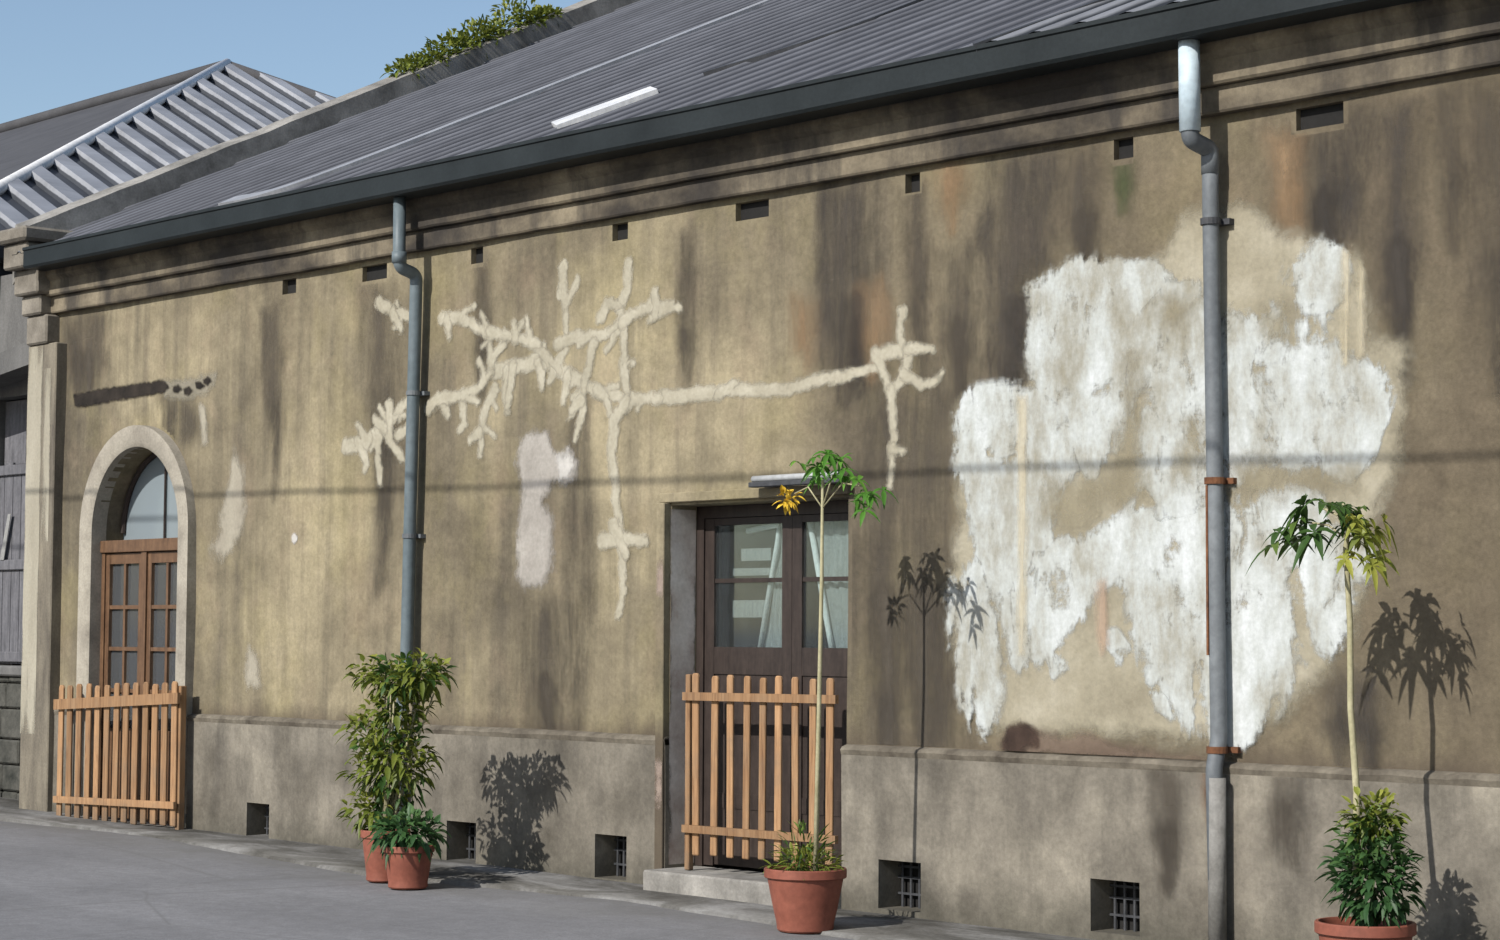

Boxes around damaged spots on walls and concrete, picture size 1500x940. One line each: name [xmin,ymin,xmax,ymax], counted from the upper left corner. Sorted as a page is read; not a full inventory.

flaking render [557,448,574,481]
crack [341,257,944,620]
flaking render [946,202,1407,760]